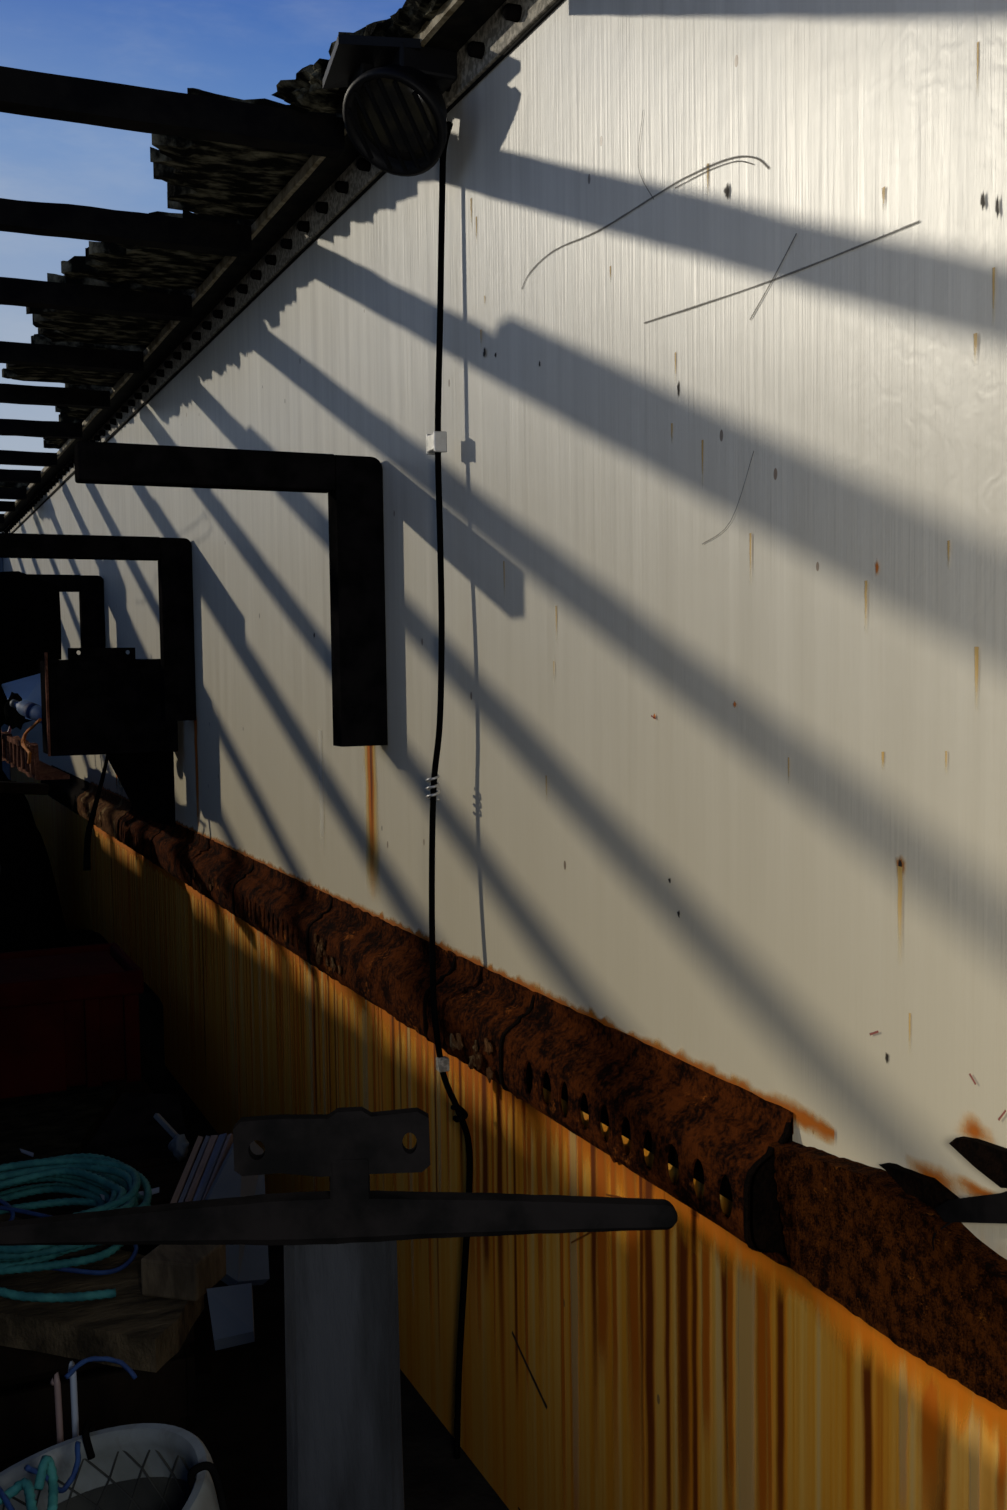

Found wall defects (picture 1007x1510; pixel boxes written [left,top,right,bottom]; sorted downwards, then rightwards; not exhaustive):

rust [176,719,834,1141]
rust [83,803,1007,1510]